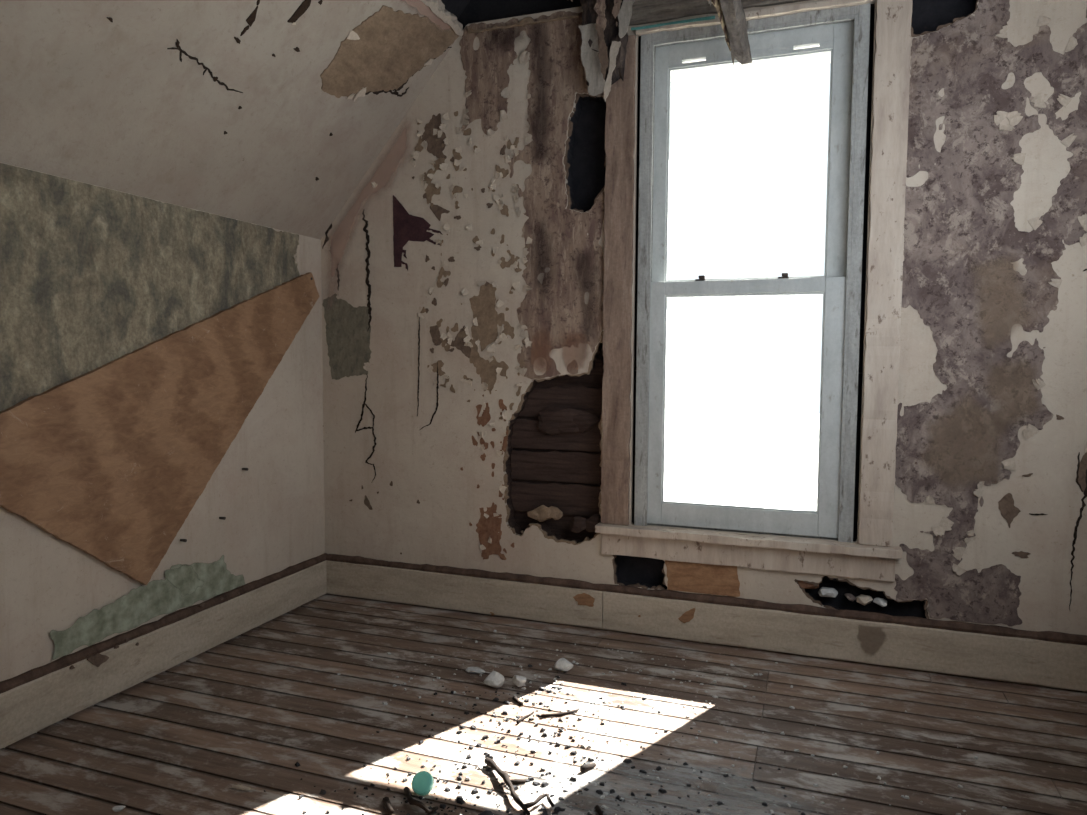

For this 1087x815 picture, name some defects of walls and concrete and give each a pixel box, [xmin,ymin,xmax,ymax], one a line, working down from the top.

crack [167,39,243,93]
peeling [320,5,606,560]
peeling [794,0,1087,626]
crack [355,375,376,481]
peeling [612,555,740,597]
crack [1069,452,1087,610]